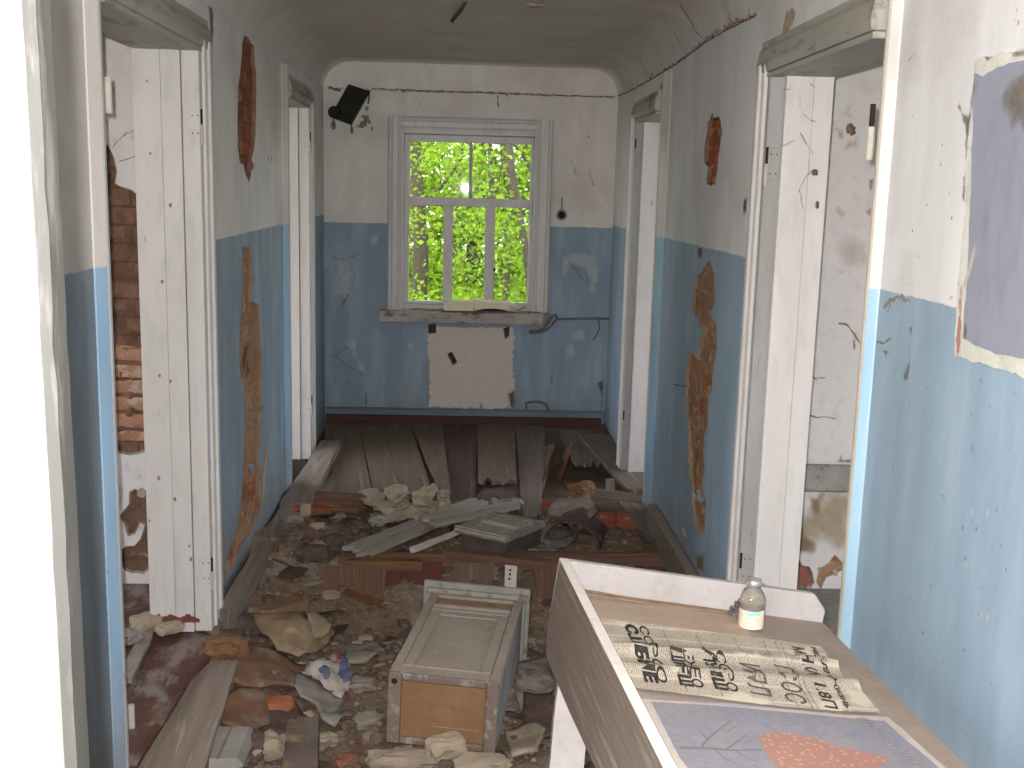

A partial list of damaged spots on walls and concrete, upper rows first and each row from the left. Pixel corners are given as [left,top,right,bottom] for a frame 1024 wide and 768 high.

crack [339,3,756,107]
spalling [238,35,256,182]
spalling [704,113,722,186]
flaking render [106,144,145,455]
peeling [227,247,268,574]
flaking render [427,323,525,409]
peeling [673,248,717,538]
peeling [120,488,149,574]
damp [800,492,848,555]